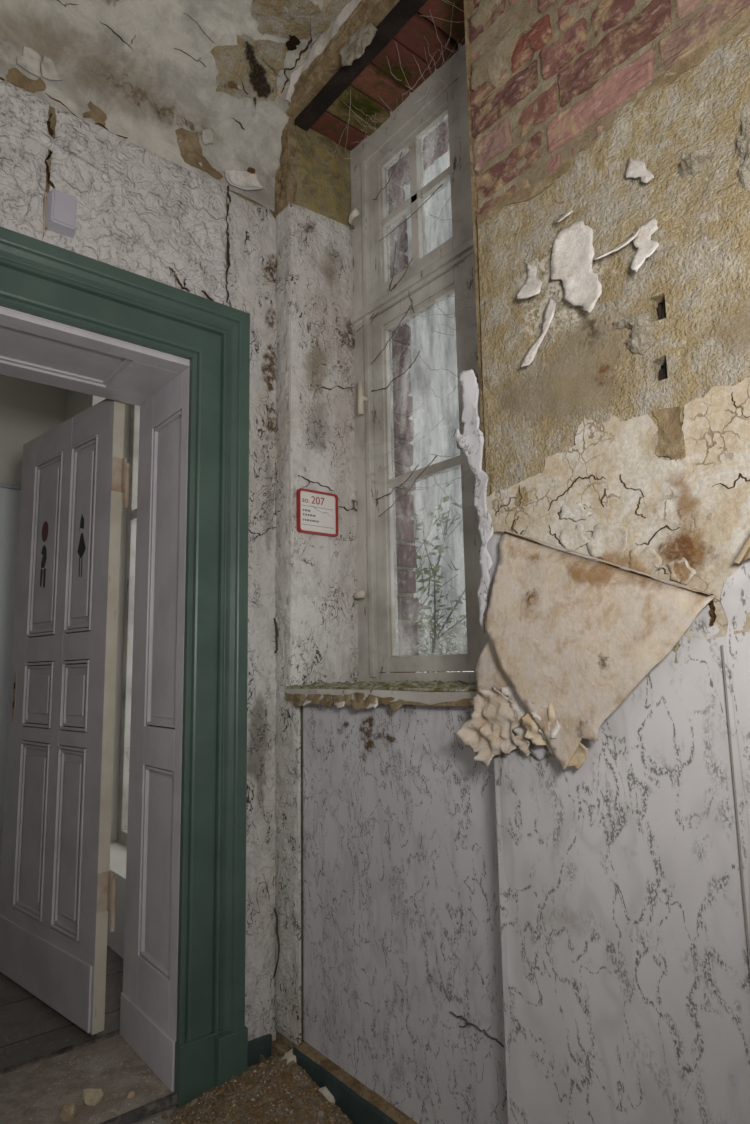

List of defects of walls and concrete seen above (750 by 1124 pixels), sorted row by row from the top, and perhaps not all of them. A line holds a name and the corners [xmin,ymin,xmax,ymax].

flaking render [6,46,63,93]
crack [224,185,232,303]
flaking render [175,0,750,664]
water stain [262,344,277,391]
peeling [293,698,345,708]
crack [449,1011,504,1047]